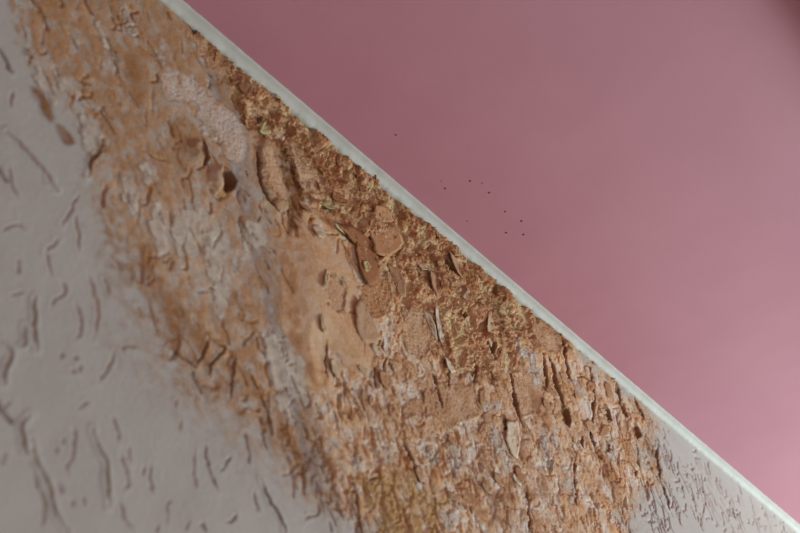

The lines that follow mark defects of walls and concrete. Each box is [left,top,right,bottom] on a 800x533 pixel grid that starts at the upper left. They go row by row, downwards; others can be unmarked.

leakage [24,0,325,458]
peeling [158,26,659,533]